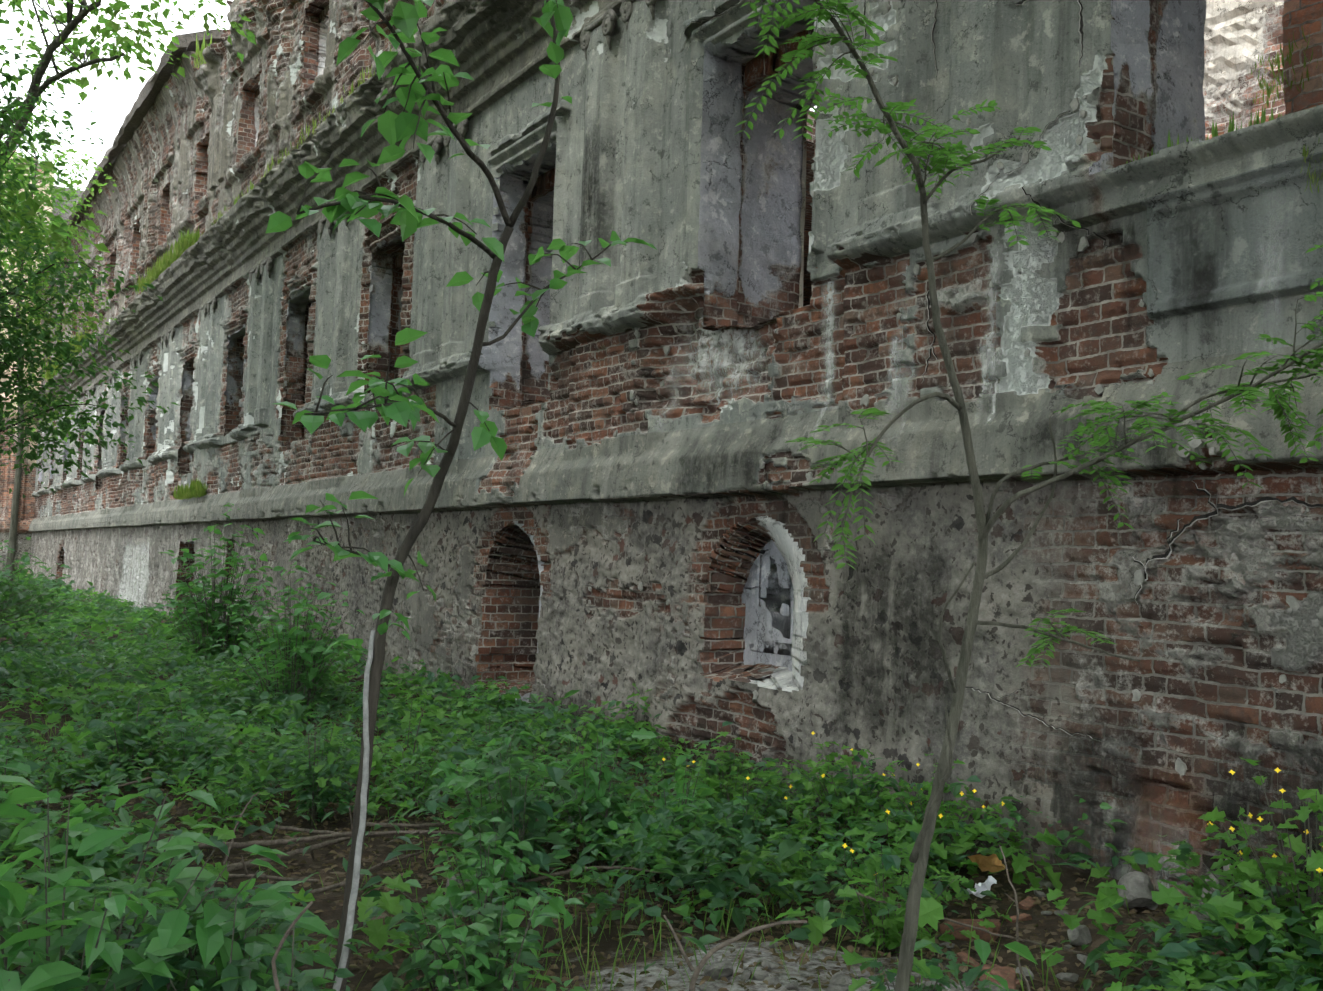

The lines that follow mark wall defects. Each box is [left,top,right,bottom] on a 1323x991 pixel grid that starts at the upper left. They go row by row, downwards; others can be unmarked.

crack [1076,0,1084,69]
flaking render [771,49,1168,414]
crack [970,111,1107,252]
flaking render [475,310,676,500]
flaking render [752,449,834,496]
crack [1133,482,1323,604]
flaking render [1120,477,1323,871]